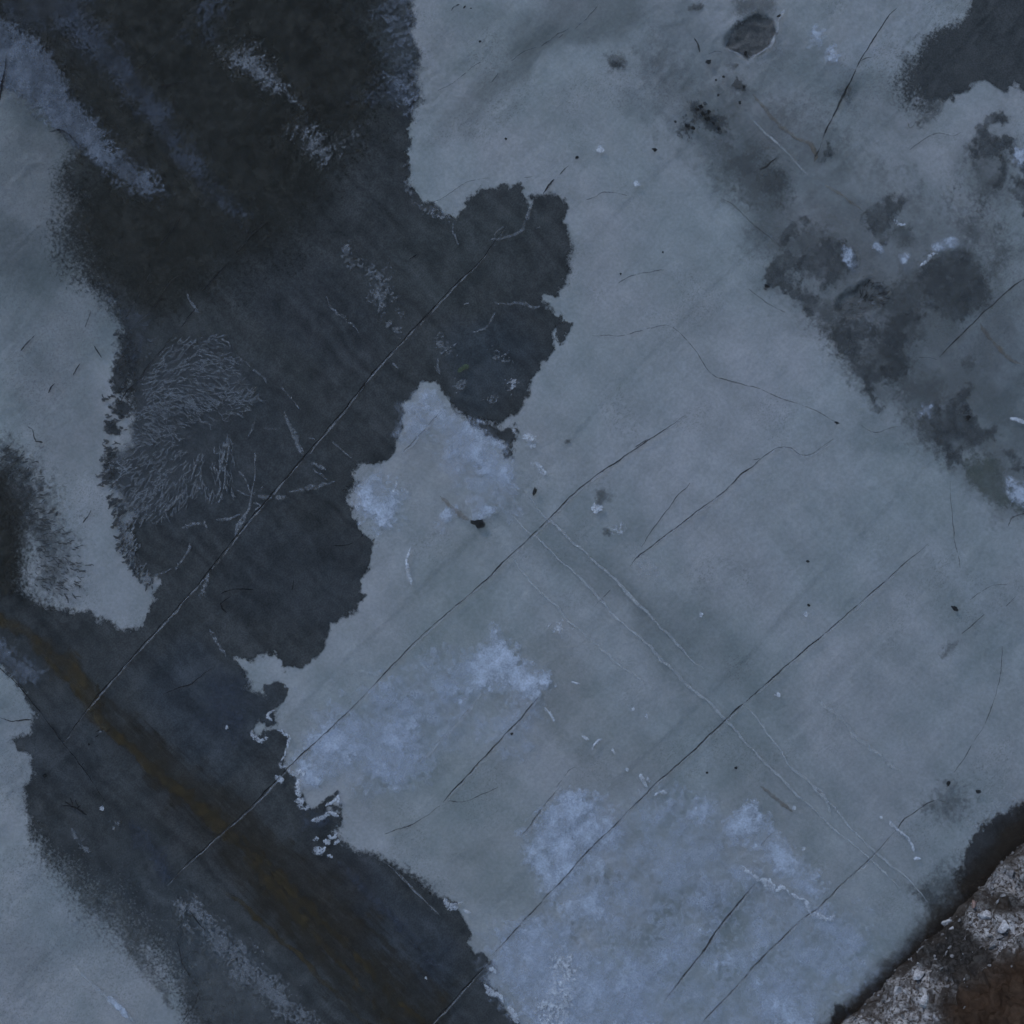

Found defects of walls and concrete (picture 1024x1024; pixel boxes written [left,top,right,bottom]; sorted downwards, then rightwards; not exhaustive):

crack [814,11,893,159]
leakage [889,0,1024,125]
crack [0,220,502,815]
leakage [0,0,658,1024]
crack [600,325,835,565]
leakage [764,216,997,466]
leakage [863,195,911,250]
leakage [1006,450,1024,503]
crack [174,416,684,878]
crack [431,551,944,1024]
efflorescence [726,800,835,921]